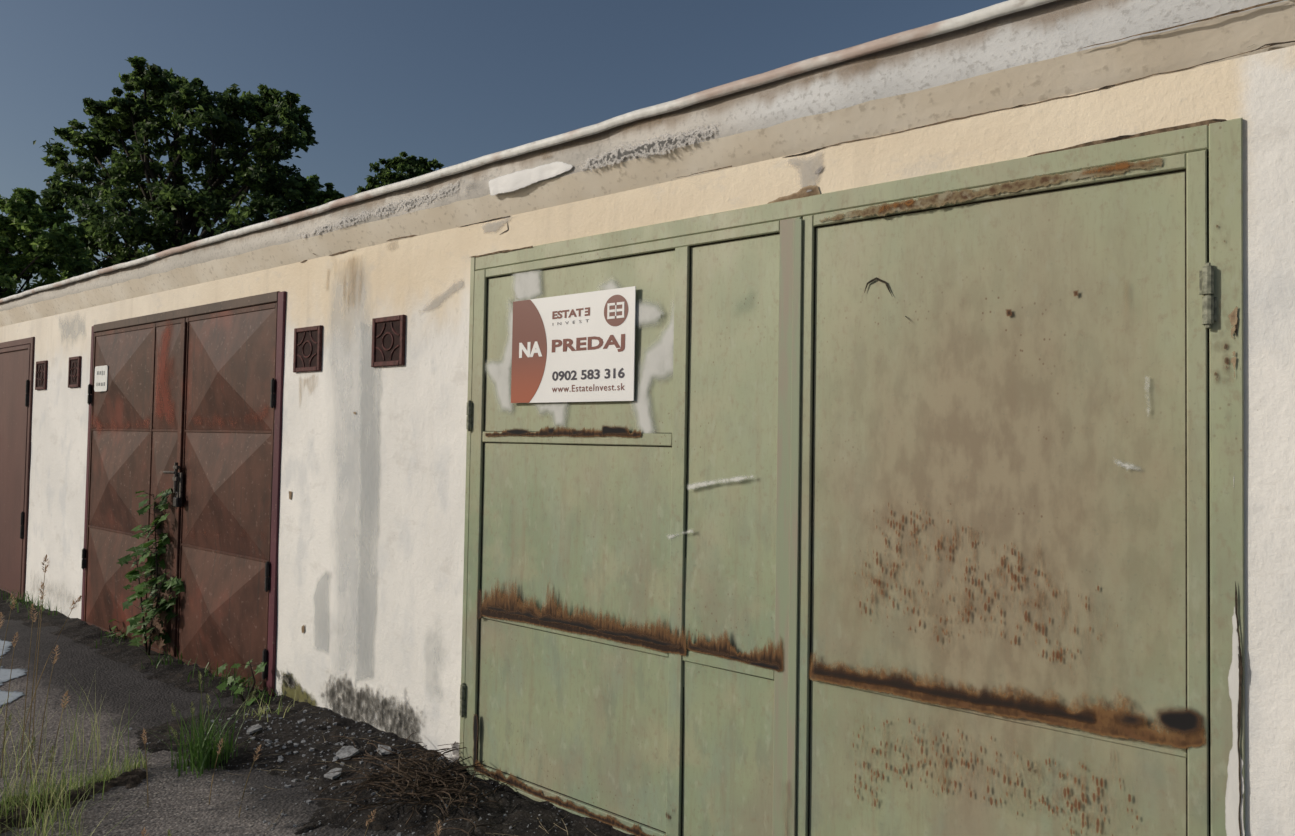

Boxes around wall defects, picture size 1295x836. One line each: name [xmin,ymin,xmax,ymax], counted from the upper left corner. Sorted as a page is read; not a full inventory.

rust [819,158,1163,222]
rust [485,425,641,438]
leakage [321,590,423,742]
rust [473,714,666,836]
rust [477,582,783,672]
rust [855,503,1099,668]
rust [853,717,1116,836]
rust [809,654,1206,749]
peeling [1225,607,1245,836]